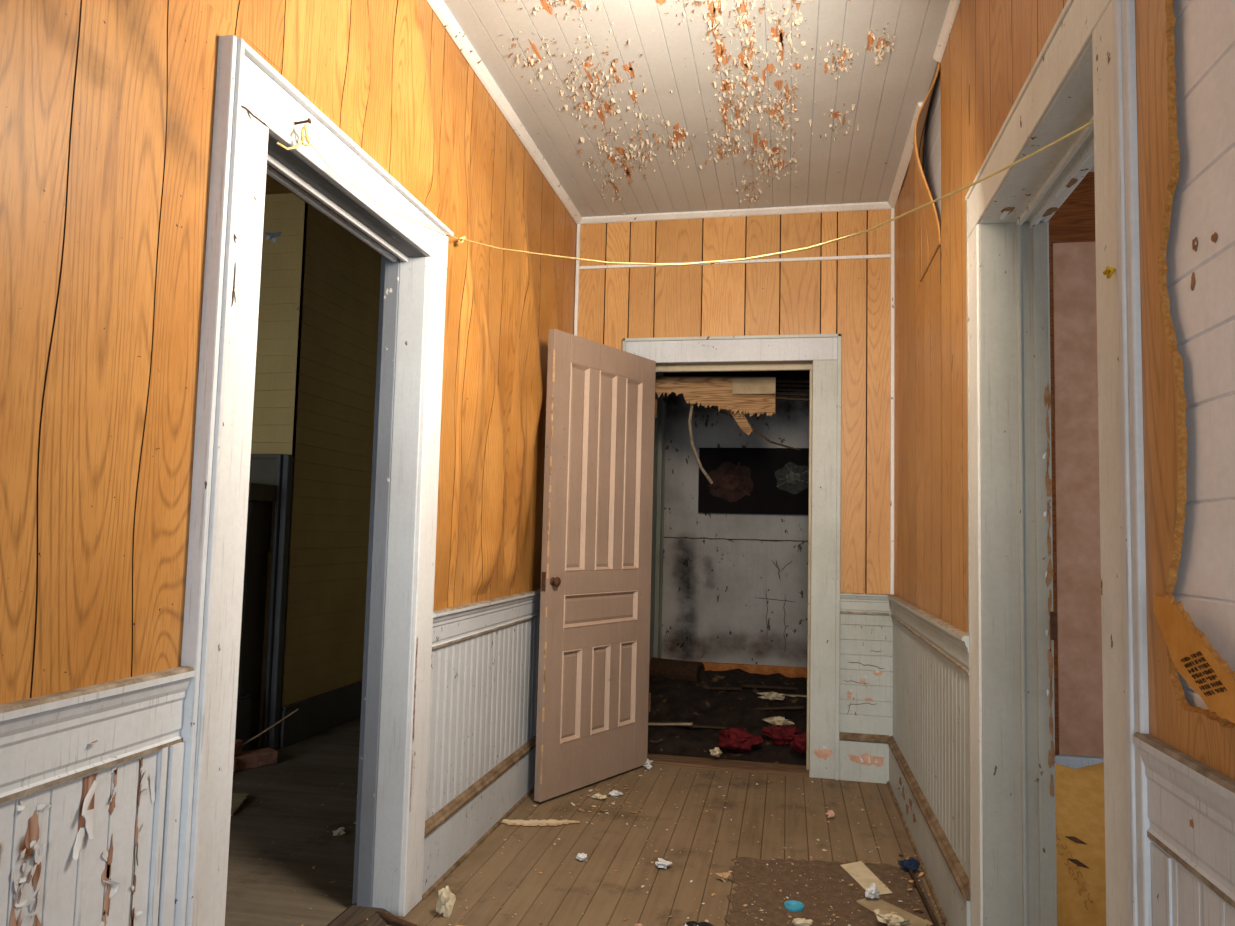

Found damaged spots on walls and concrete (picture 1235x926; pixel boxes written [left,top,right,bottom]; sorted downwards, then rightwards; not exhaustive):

peeling [501,0,896,215]
peeling [1192,232,1218,252]
damp [678,540,693,599]
peeling [814,745,884,767]
peeling [72,755,119,861]
peeling [135,758,156,845]
peeling [9,798,52,926]
peeling [98,837,143,926]